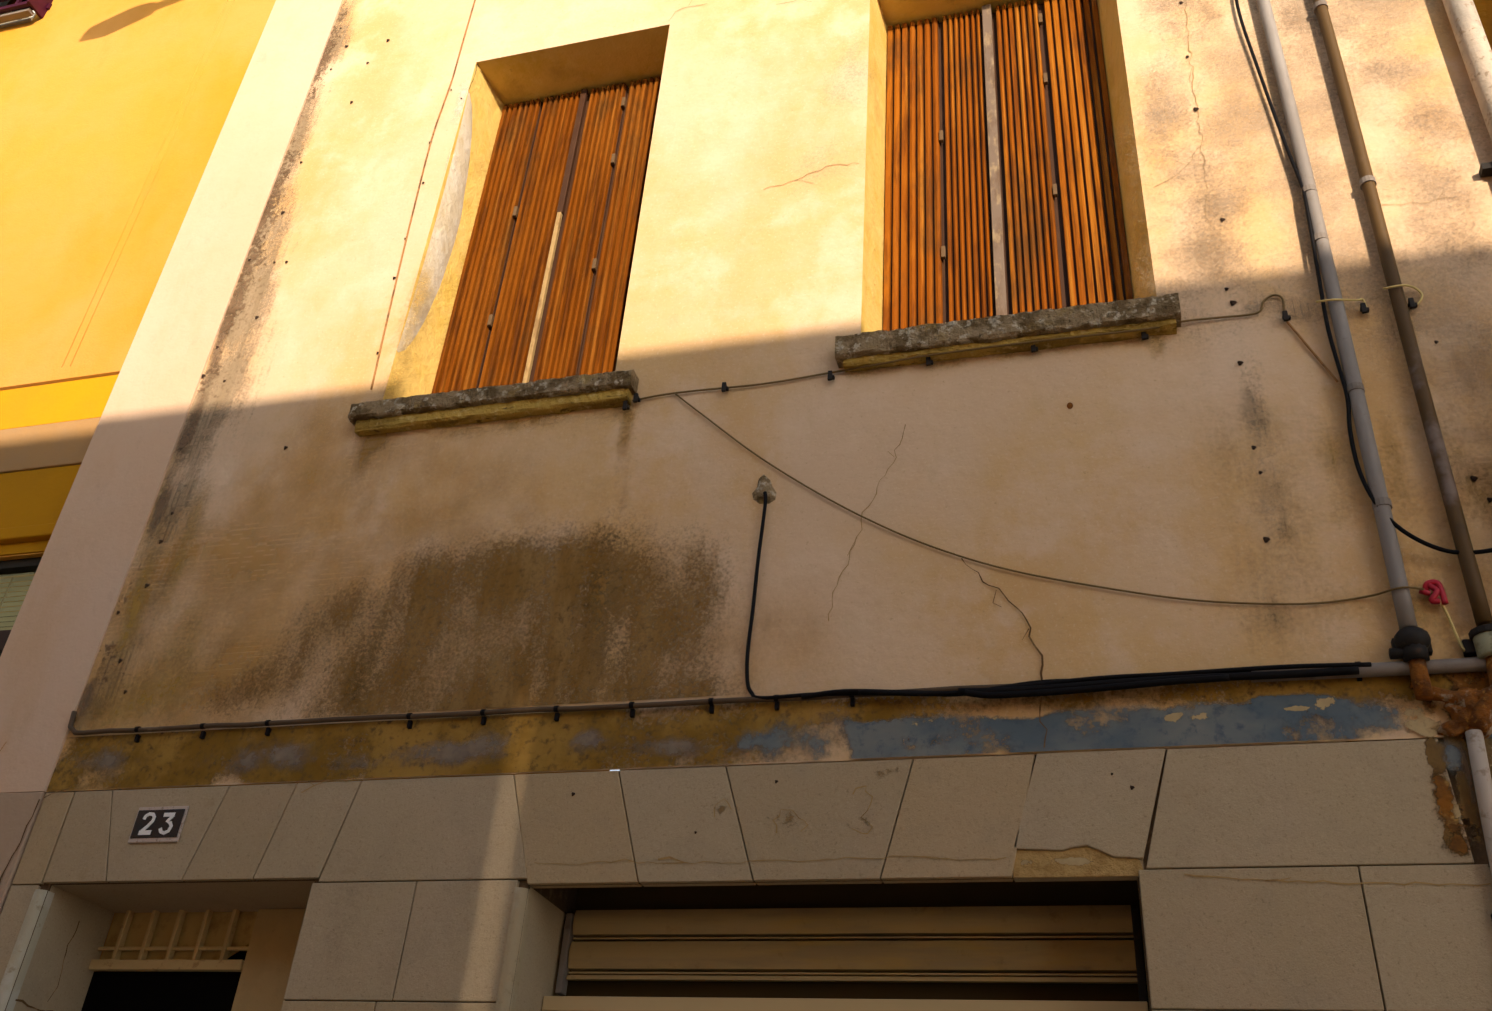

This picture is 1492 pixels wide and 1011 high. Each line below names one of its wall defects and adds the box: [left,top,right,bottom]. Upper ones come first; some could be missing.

leakage [212,314,231,370]
leakage [178,394,204,451]
leakage [150,491,169,529]
crack [828,424,906,621]
leakage [47,531,1415,791]
crack [961,558,1048,748]
rust [1410,671,1492,739]
peeling [728,693,1482,857]
rust [1431,773,1470,855]
spalling [1013,846,1143,878]